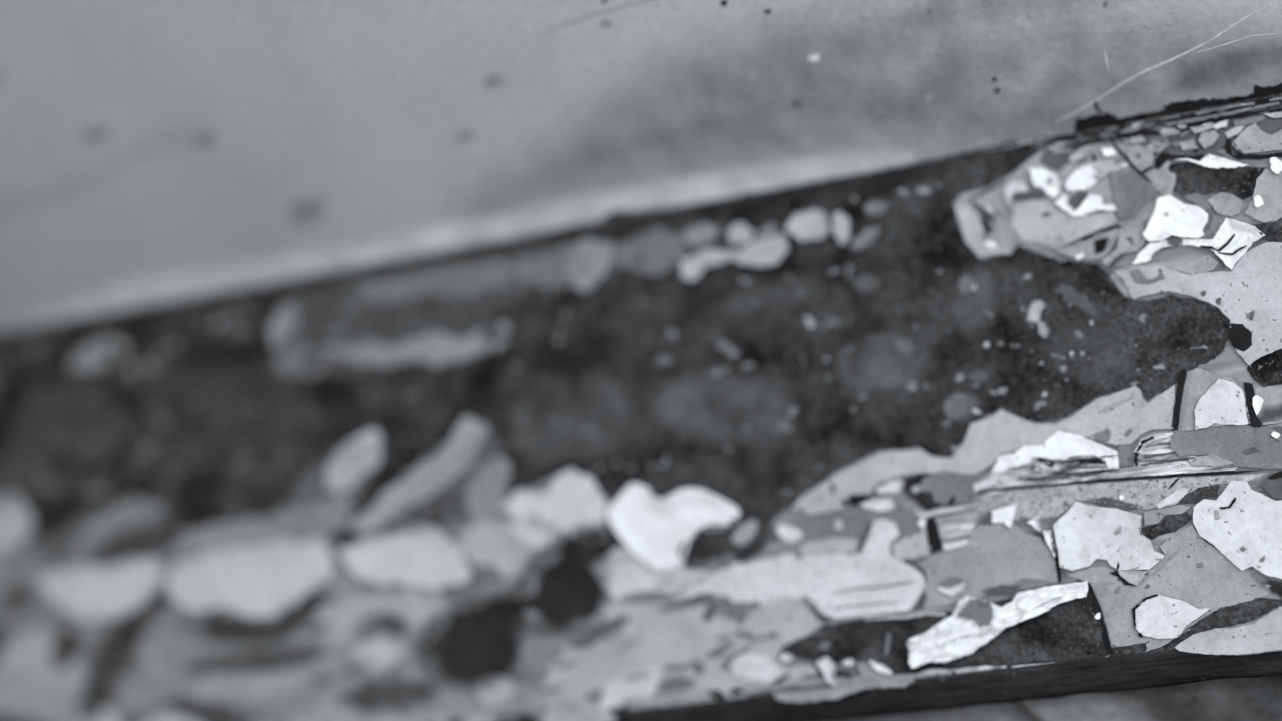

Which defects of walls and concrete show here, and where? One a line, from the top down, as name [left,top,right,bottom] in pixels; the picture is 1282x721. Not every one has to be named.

peeling [343,200,890,314]
peeling [955,116,1282,366]
peeling [70,337,129,373]
peeling [269,302,511,378]
peeling [0,368,1282,721]